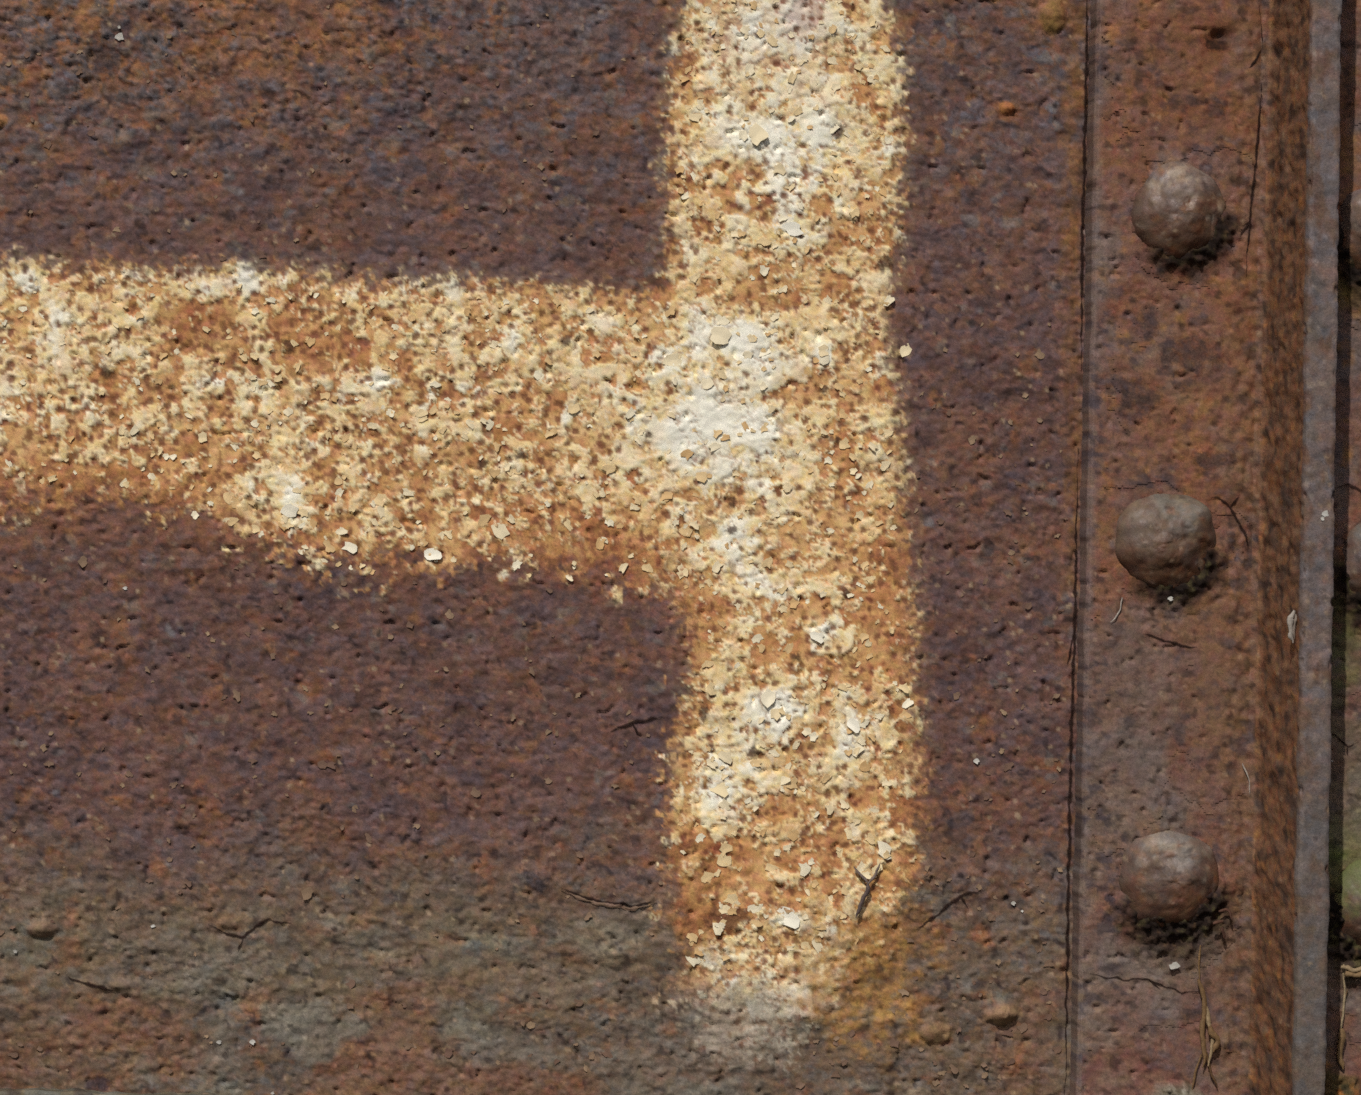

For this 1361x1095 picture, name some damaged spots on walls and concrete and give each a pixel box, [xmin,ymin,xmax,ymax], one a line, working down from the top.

rust [141,0,431,122]
rust [906,0,1263,612]
rust [0,444,282,586]
peeling [102,352,264,537]
peeling [278,474,457,575]
rust [485,505,725,653]
peeling [563,311,780,595]
peeling [748,324,897,667]
peeling [689,660,914,891]
rust [762,276,1192,1095]
rust [646,830,727,978]
peeling [685,858,850,970]